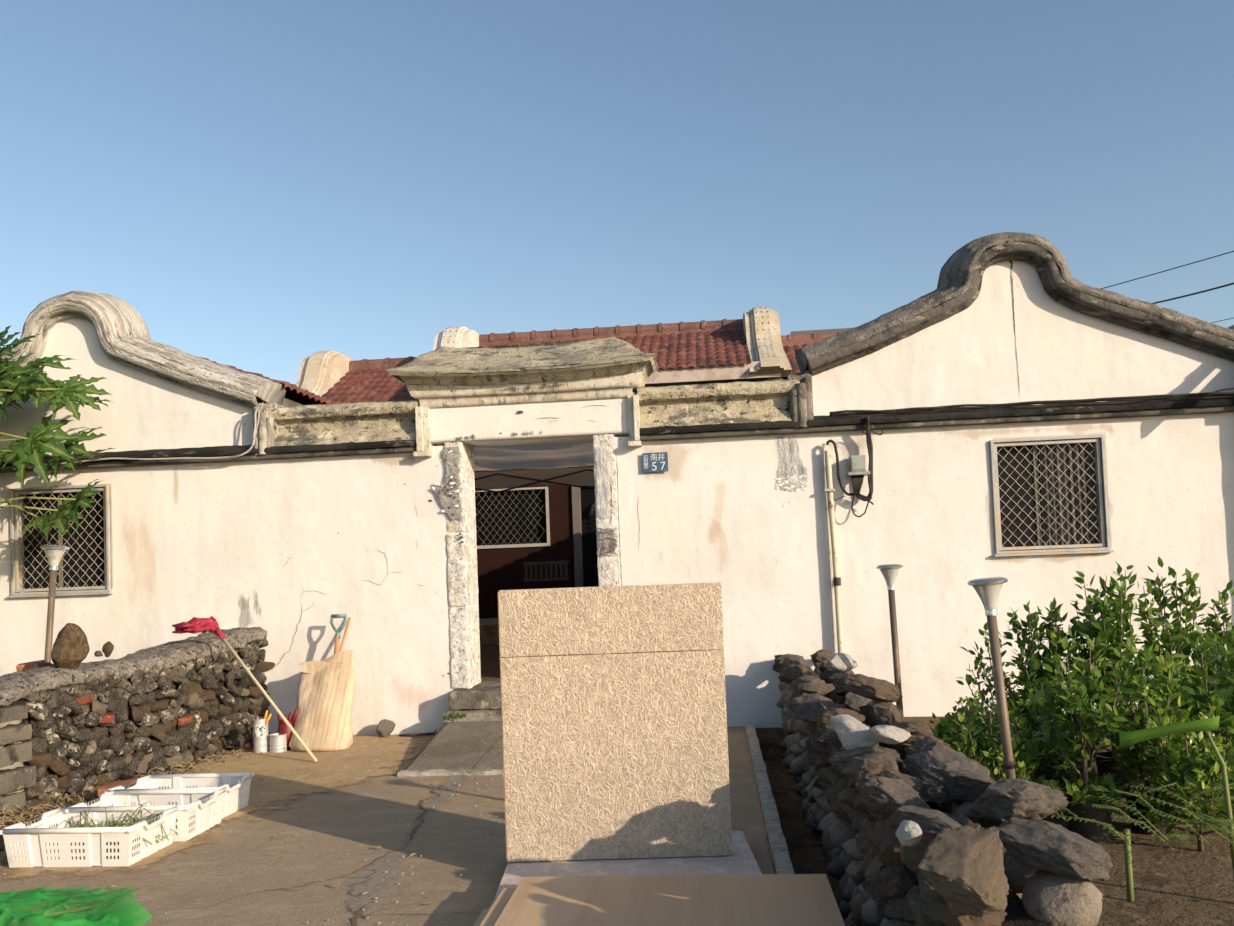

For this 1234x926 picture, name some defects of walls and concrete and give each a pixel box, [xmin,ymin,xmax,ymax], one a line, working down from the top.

spalling [428,446,464,543]
peeling [774,437,809,507]
crack [276,590,323,666]